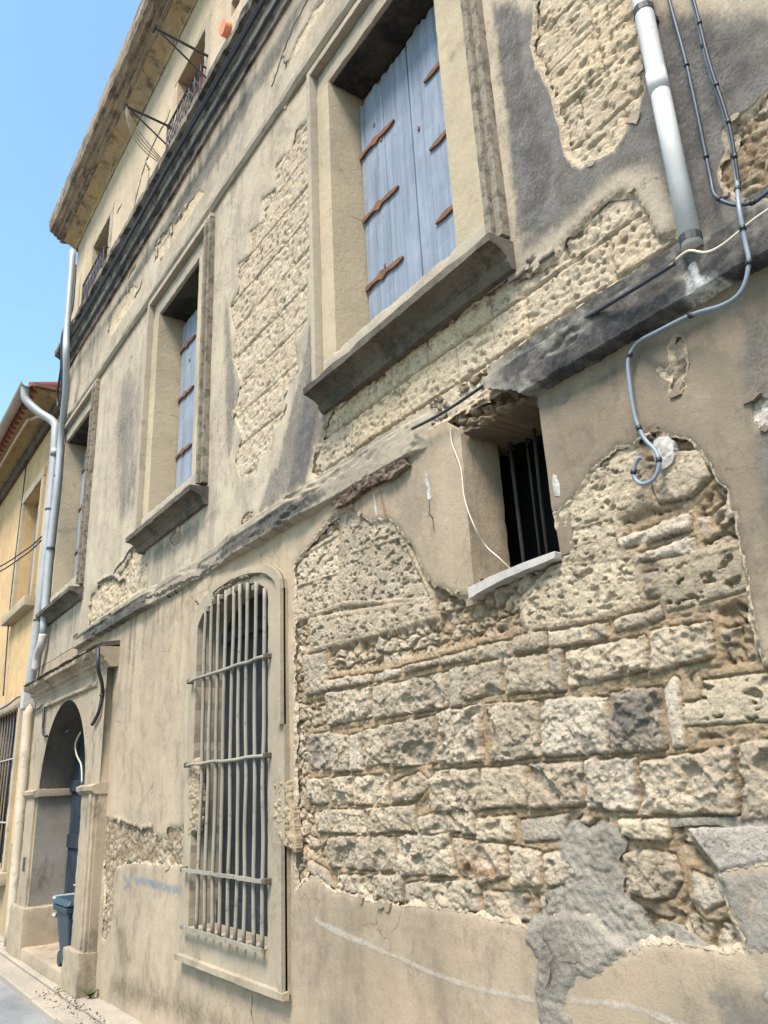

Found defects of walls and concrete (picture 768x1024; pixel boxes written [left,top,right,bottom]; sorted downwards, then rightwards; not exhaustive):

water stain [494,2,670,245]
spalling [530,0,645,168]
water stain [657,14,768,236]
spalling [718,91,768,203]
spalling [229,121,310,478]
spalling [312,185,679,480]
spalling [655,333,690,399]
spalling [87,549,148,626]
spalling [273,426,768,955]
spalling [102,757,206,941]
crack [540,927,579,989]